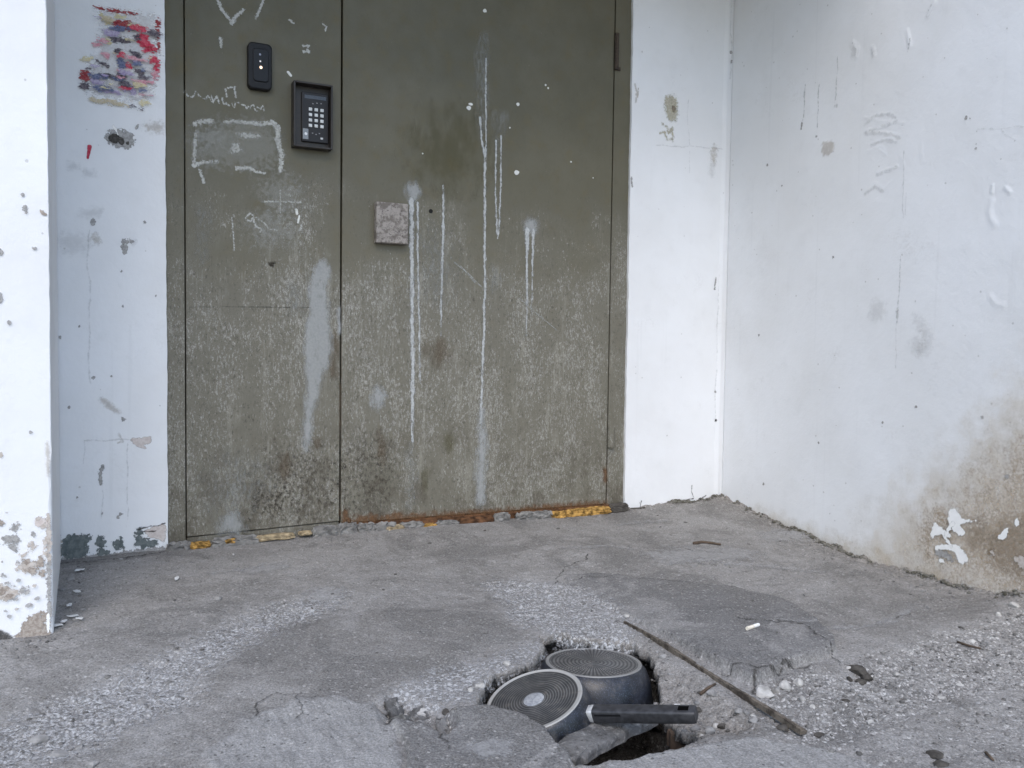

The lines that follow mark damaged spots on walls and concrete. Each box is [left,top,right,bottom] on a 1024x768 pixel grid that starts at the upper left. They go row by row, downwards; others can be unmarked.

peeling [0,512,167,639]
corrosion [343,501,608,523]
peeling [930,508,976,565]
water stain [939,469,1024,591]
peeling [989,518,1019,556]
crack [726,617,841,694]